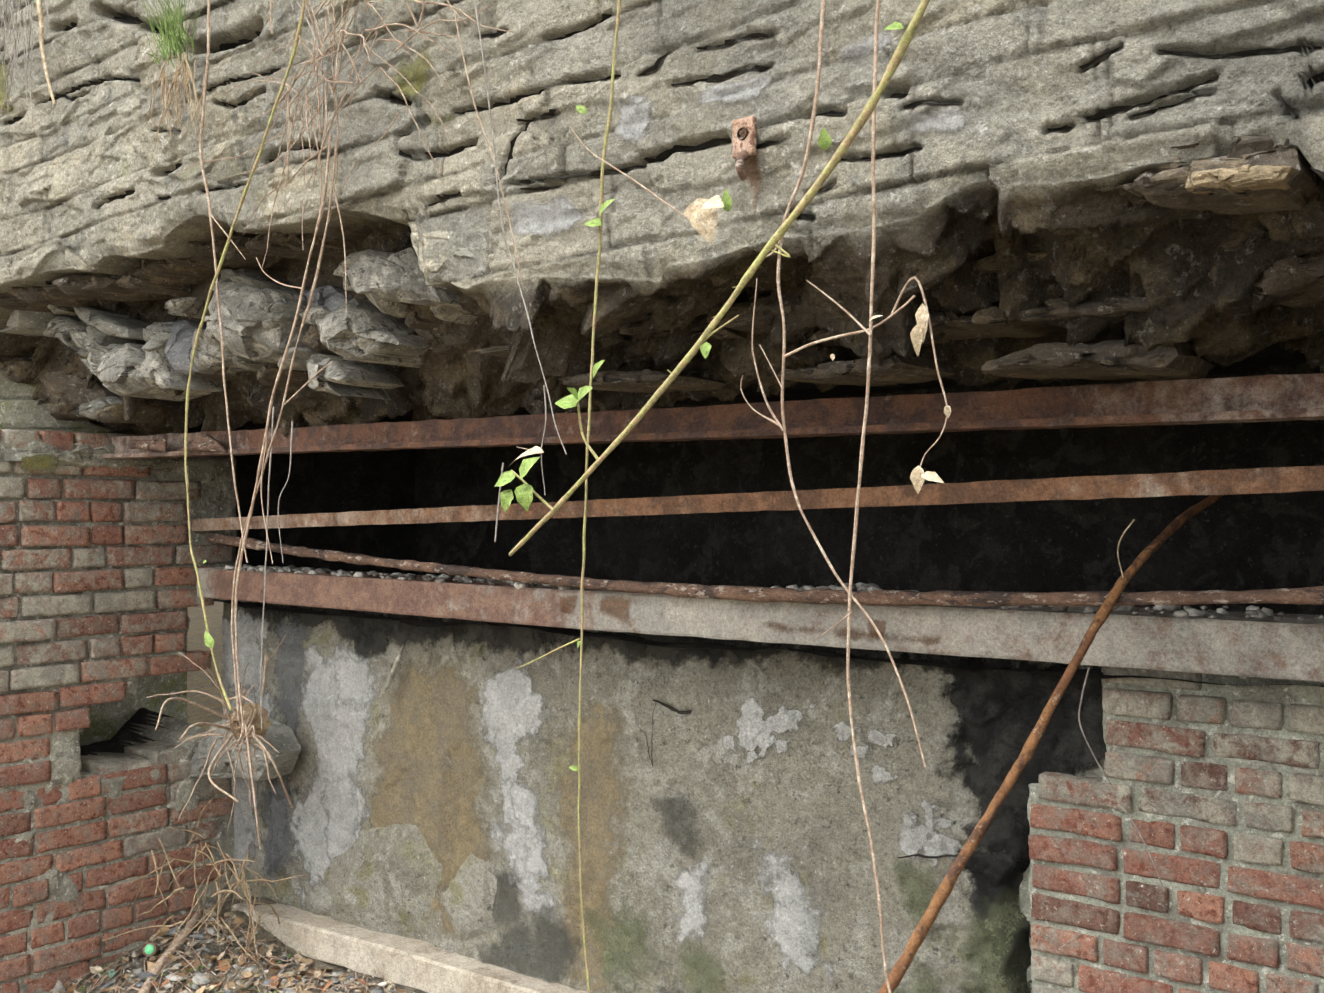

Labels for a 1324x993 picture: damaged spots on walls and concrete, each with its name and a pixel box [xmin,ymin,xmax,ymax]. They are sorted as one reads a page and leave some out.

corrosion [744,155,759,202]
corrosion [127,434,227,452]
corrosion [561,596,576,614]
corrosion [600,597,628,620]
corrosion [835,620,885,638]
spalling [187,717,301,781]
water stain [654,798,721,993]
efflorescence [753,840,833,984]
water stain [895,864,937,928]
water stain [955,806,1032,993]